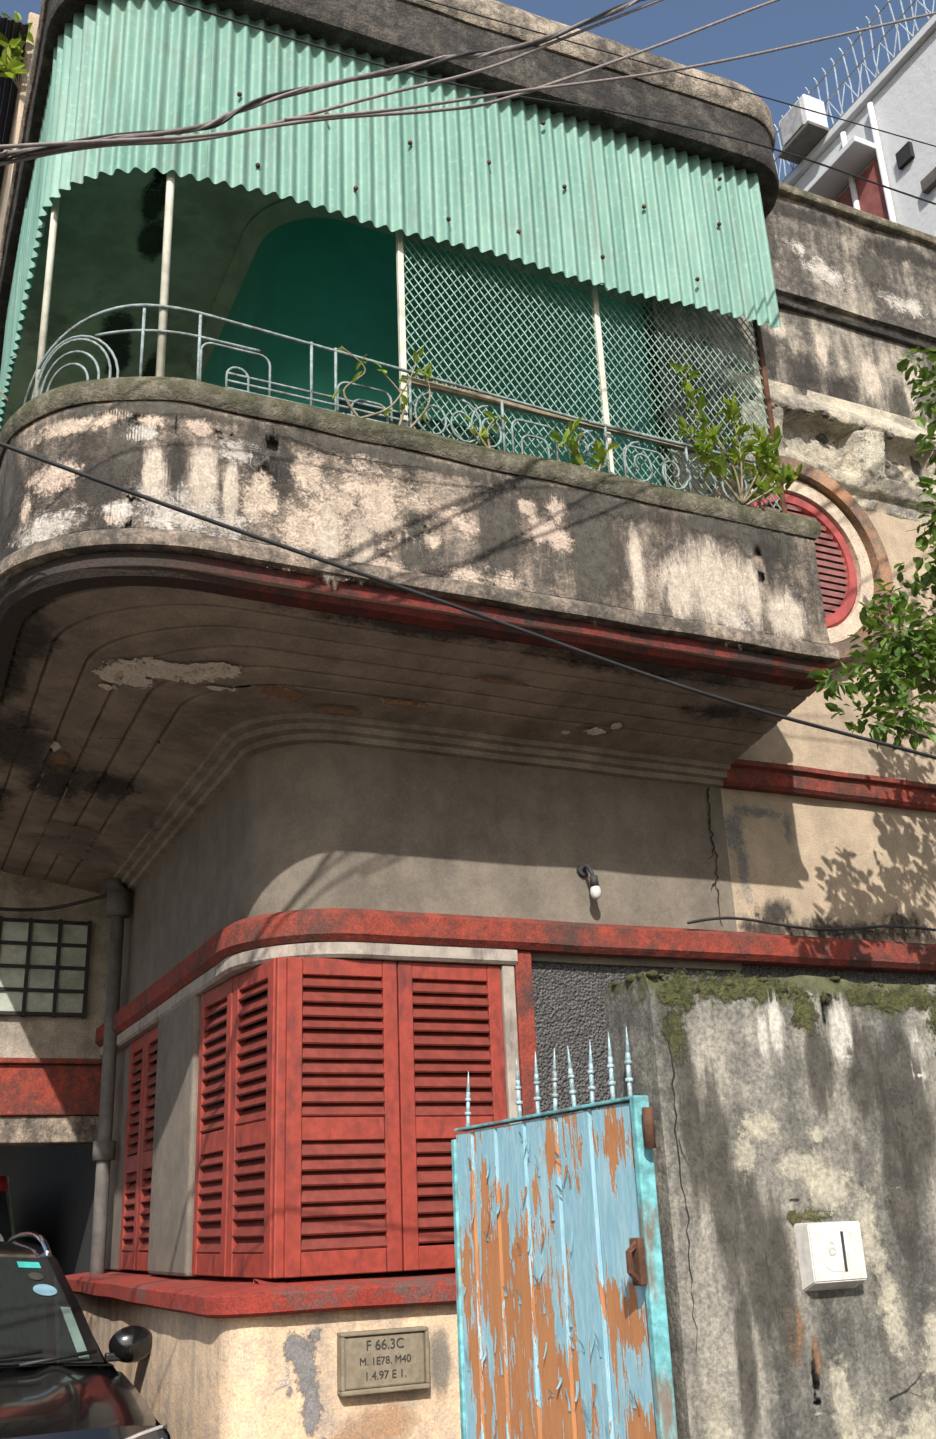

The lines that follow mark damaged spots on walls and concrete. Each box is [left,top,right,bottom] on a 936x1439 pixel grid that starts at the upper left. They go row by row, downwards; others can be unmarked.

damp [0,610,140,819]
peeling [91,656,245,692]
damp [0,401,474,577]
damp [314,612,503,645]
damp [524,645,755,686]
damp [479,477,806,640]
crack [706,787,723,926]
damp [758,1000,783,1056]
damp [806,1002,934,1261]
damp [676,1040,797,1439]